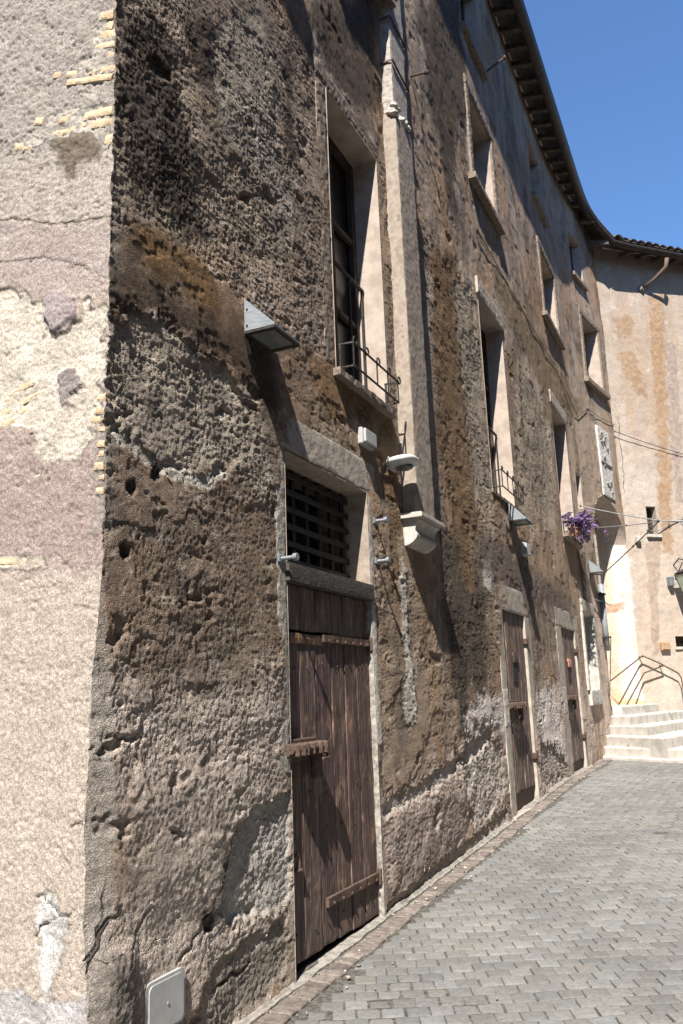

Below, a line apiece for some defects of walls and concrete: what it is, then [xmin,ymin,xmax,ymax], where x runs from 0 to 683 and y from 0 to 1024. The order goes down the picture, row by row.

leakage [51,130,101,177]
flaking render [14,0,304,278]
crack [0,216,109,280]
flaking render [0,286,254,535]
leakage [108,269,278,422]
peeling [33,891,71,1005]